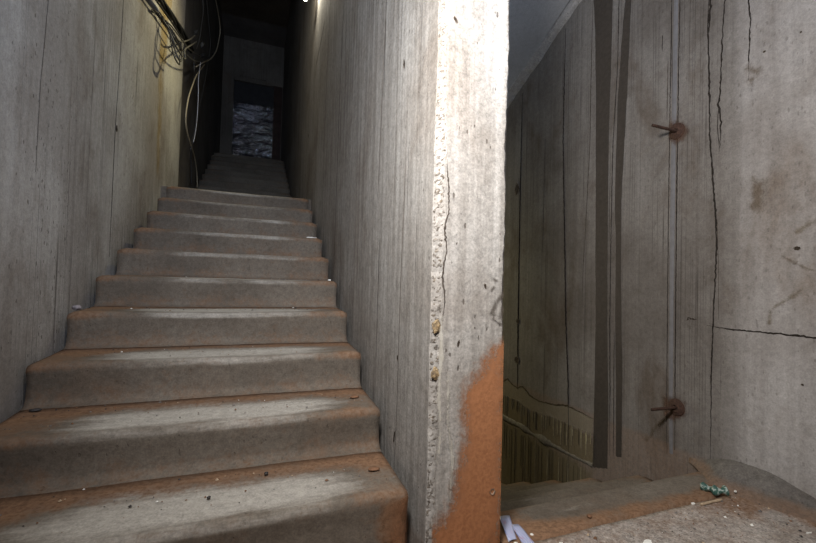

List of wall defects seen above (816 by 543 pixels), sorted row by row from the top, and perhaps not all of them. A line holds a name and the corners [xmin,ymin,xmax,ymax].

crack [441,161,450,314]
crack [707,0,816,458]